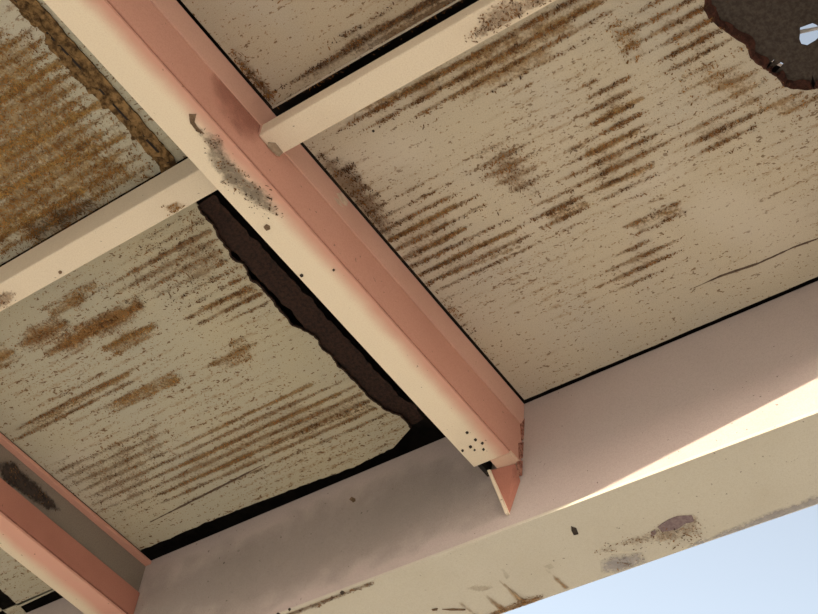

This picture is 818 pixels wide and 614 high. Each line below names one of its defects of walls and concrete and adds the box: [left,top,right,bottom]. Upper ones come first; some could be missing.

corrosion [228,0,463,109]
corrosion [338,0,818,154]
corrosion [0,203,270,381]
corrosion [317,74,670,360]
corrosion [600,201,686,295]
crack [694,238,818,288]
corrosion [0,461,60,512]
corrosion [13,368,184,442]
corrosion [52,374,390,517]